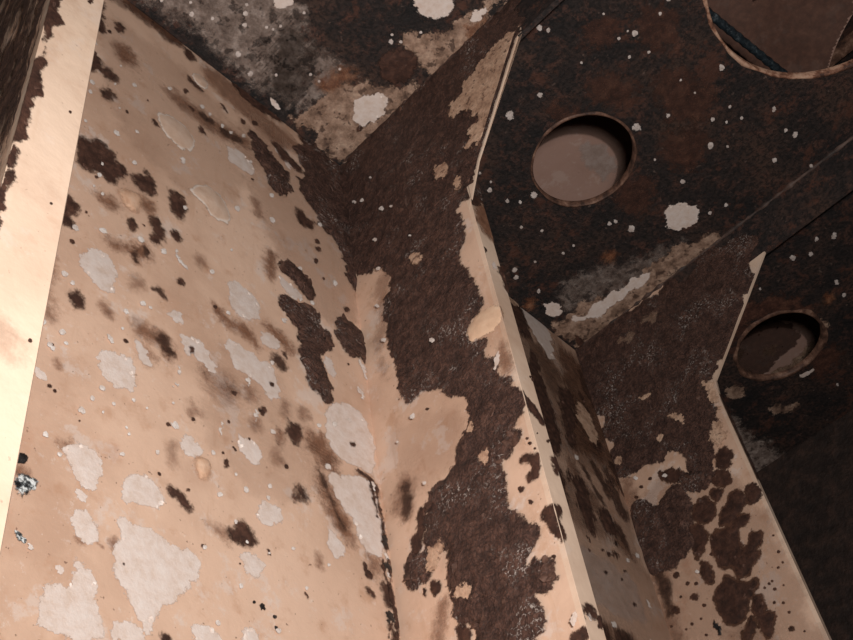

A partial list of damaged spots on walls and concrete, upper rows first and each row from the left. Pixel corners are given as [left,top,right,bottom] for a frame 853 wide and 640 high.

corrosion [88,0,125,34]
peeling [413,0,454,19]
corrosion [0,0,65,227]
peeling [352,92,388,130]
corrosion [62,195,88,229]
corrosion [77,136,182,263]
peeling [664,203,712,231]
corrosion [68,290,85,309]
corrosion [167,0,634,640]
peeling [224,338,281,400]
corrosion [557,234,853,640]
peeling [36,516,201,640]